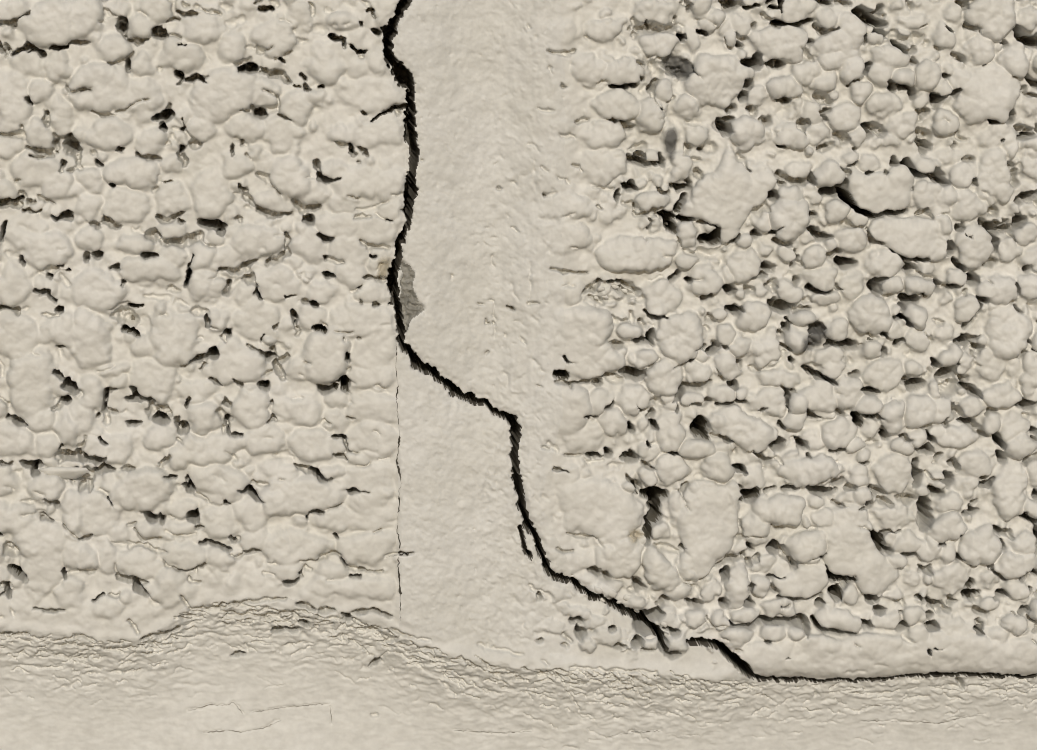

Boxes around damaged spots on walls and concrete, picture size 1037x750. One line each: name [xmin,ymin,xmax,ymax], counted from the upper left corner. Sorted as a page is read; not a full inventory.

crack [371,0,1037,724]